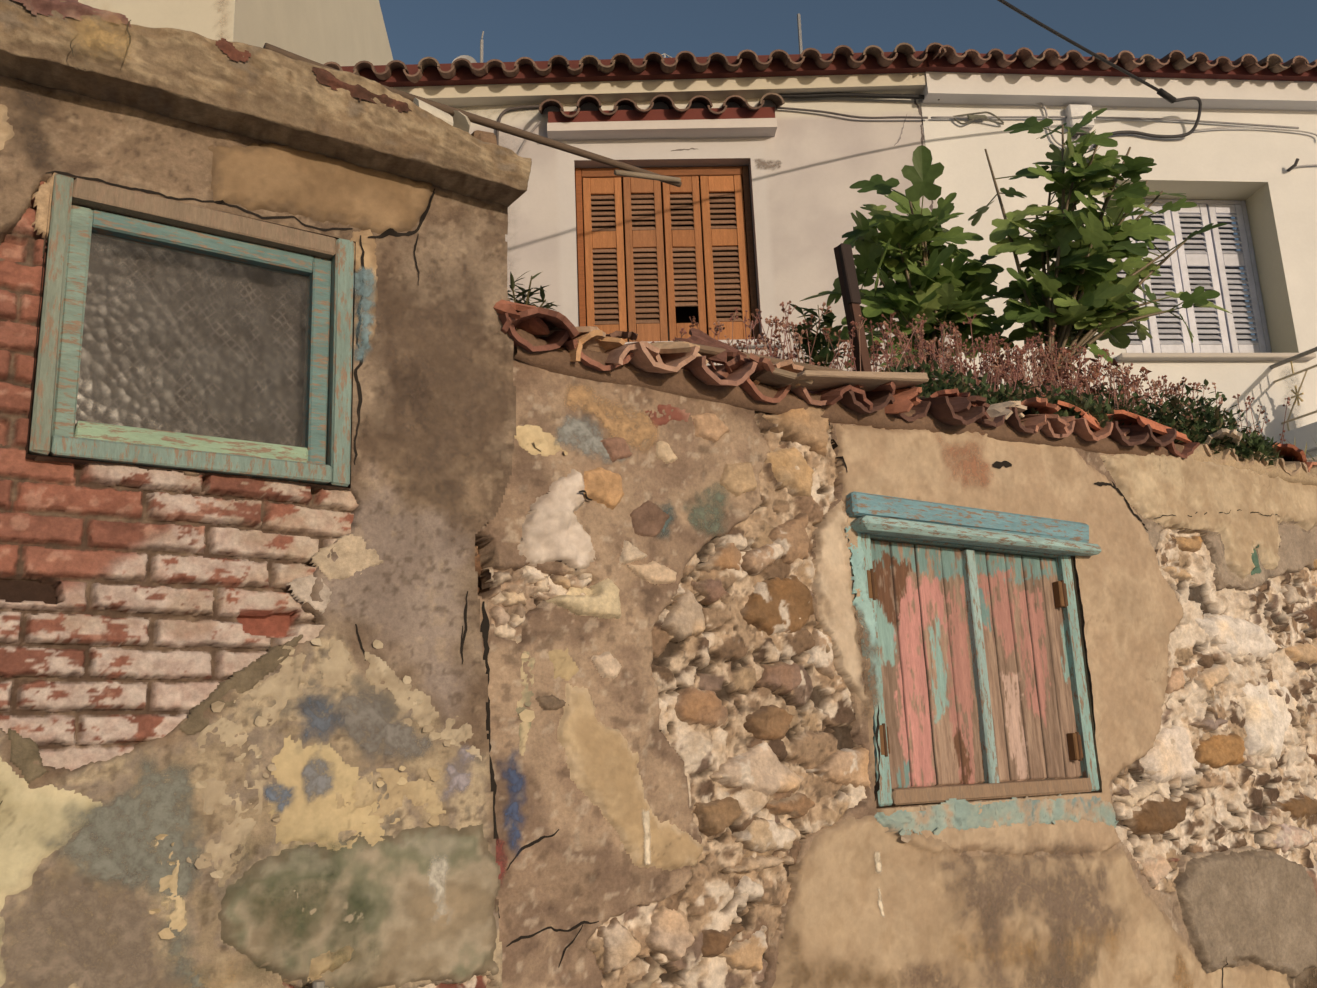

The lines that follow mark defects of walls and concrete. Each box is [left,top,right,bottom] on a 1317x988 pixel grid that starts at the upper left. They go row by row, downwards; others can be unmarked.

spalling [13,0,131,27]
spalling [312,67,411,113]
crack [46,171,435,465]
spalling [0,173,491,988]
crack [460,591,559,870]
spalling [475,545,622,880]
crack [498,907,599,968]
damp [643,810,651,864]
spalling [514,386,871,988]
peeling [845,526,880,692]
damp [943,846,1114,988]
spalling [874,527,1317,897]